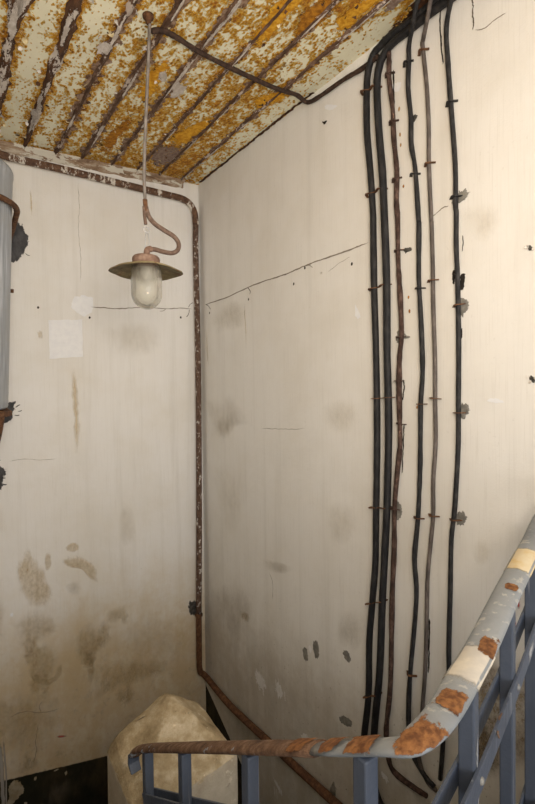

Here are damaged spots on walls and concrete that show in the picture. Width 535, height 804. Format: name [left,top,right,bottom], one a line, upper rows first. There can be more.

peeling [97,19,118,55]
peeling [170,80,188,100]
rust [0,0,428,184]
crack [95,244,364,317]